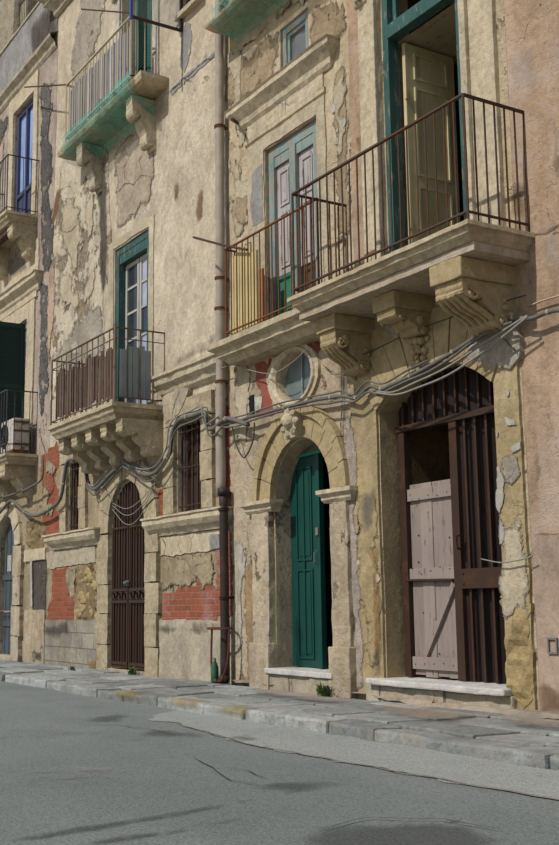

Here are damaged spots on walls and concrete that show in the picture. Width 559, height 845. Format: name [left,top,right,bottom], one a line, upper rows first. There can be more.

flaking render [70,0,105,83]
peeling [46,141,119,400]
flaking render [331,65,352,235]
crack [534,224,559,235]
spalling [26,441,100,621]
flaking render [159,529,246,652]
spalling [495,440,537,709]